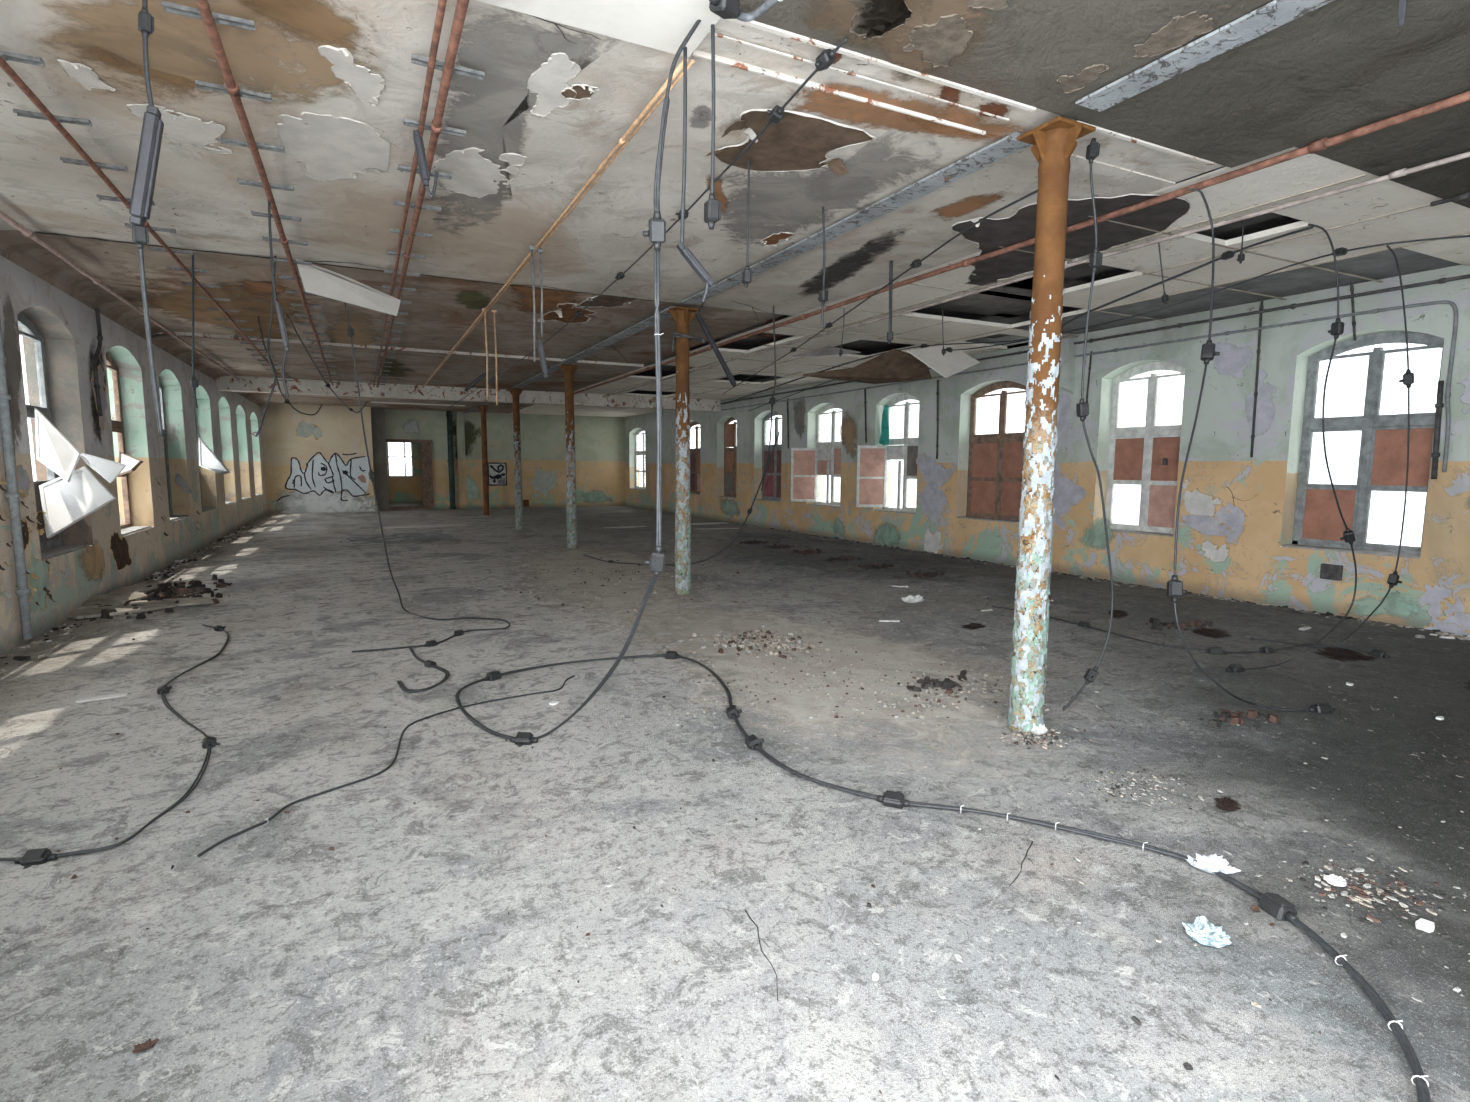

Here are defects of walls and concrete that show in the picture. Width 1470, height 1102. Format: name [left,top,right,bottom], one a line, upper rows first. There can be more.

peeling [57,59,233,154]
damp [45,0,377,103]
peeling [277,45,391,182]
peeling [432,147,527,199]
peeling [527,52,600,117]
flaking render [706,108,877,177]
peeling [846,0,1009,68]
flaking render [1065,193,1190,269]
flaking render [952,202,1087,732]
peeling [1181,480,1246,563]
peeling [1302,839,1423,946]